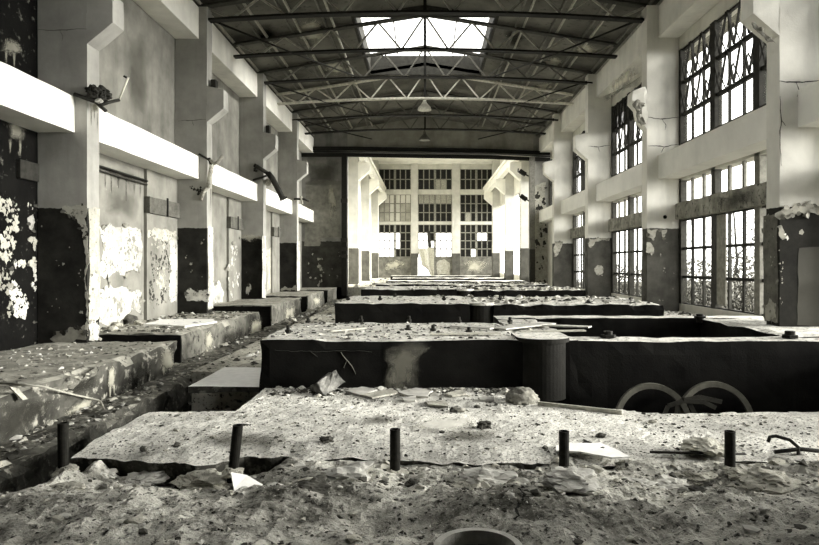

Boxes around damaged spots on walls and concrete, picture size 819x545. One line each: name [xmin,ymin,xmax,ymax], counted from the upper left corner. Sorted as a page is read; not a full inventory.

peeling [0,196,42,323]